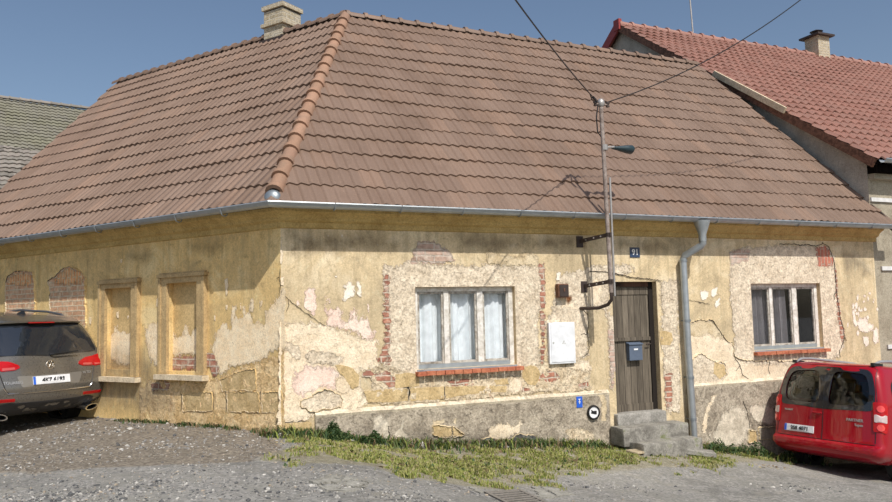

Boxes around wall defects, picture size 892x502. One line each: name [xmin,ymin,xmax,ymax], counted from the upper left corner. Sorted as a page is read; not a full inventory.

flaking render [410,240,455,265]
flaking render [5,270,37,313]
flaking render [47,266,92,329]
crack [783,242,847,357]
peeling [815,245,879,347]
peeling [111,311,130,366]
flaking render [139,250,615,439]